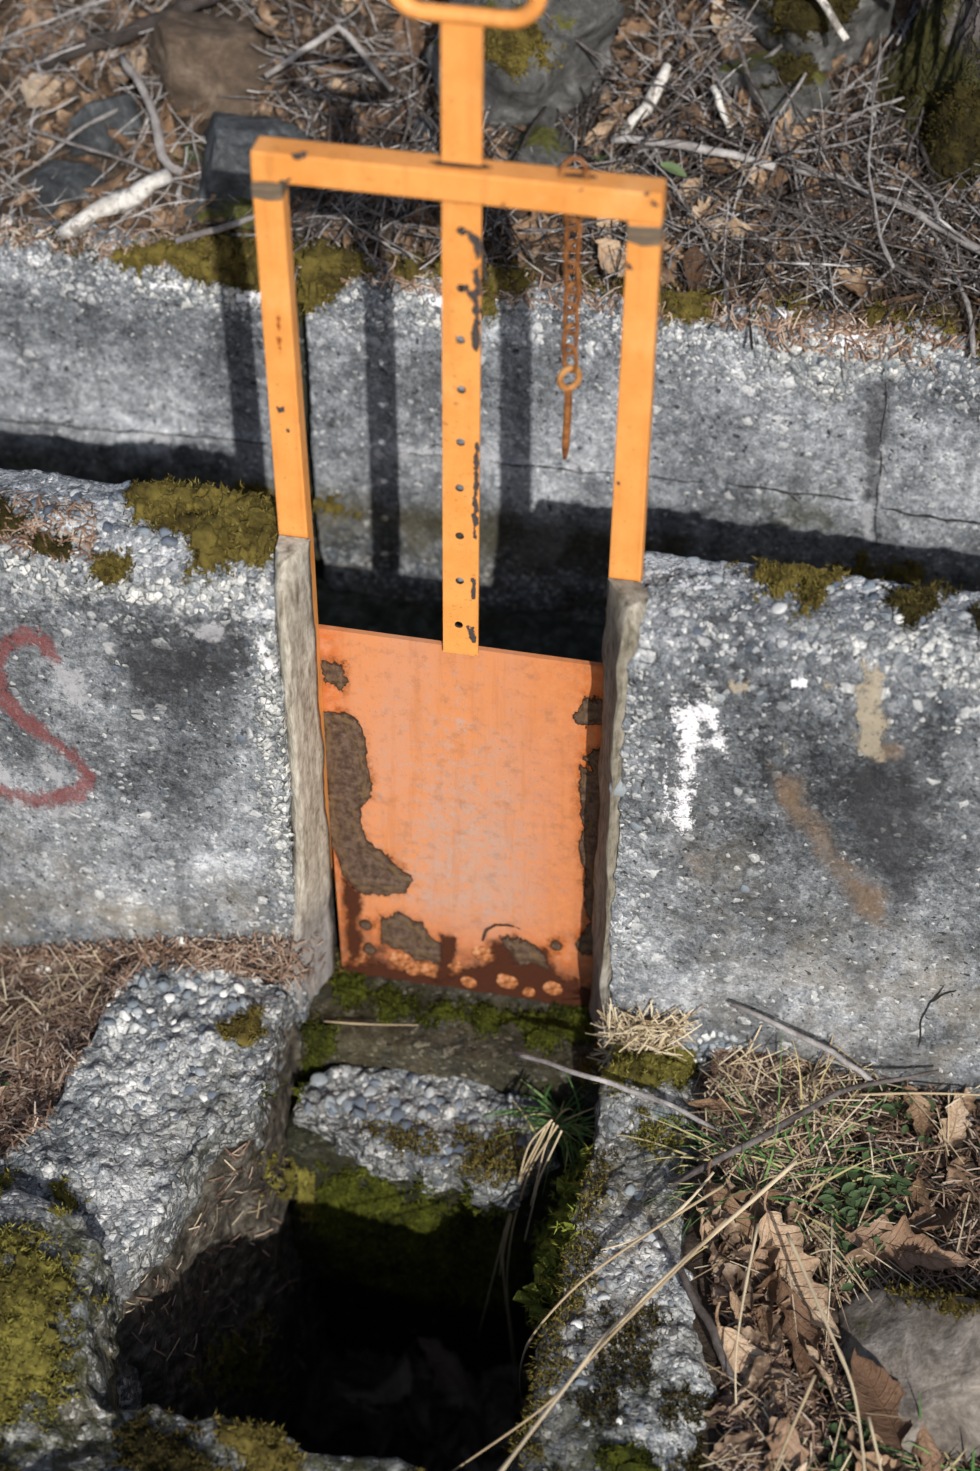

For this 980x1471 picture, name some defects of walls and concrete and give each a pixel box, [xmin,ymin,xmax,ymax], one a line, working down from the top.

corrosion [338,879,591,1008]